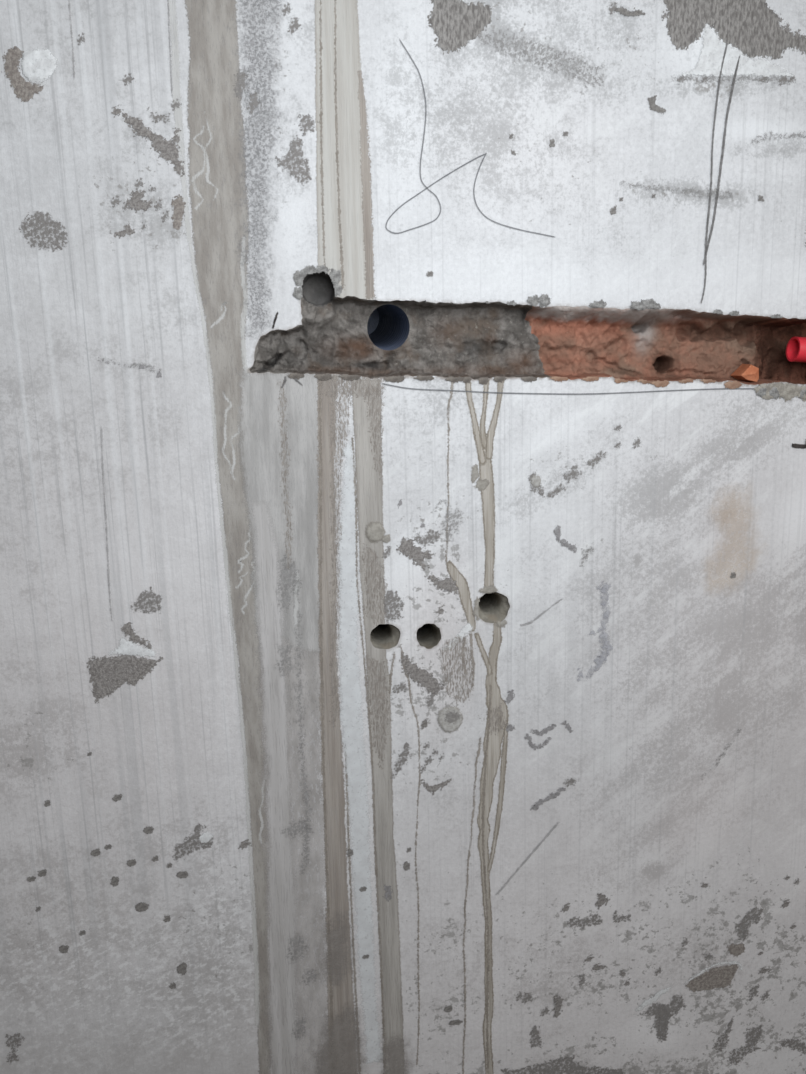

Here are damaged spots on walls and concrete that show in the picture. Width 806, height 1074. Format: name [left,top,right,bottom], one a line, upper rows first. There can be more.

peeling [2,46,57,102]
peeling [427,0,603,86]
peeling [661,0,806,60]
peeling [112,99,185,176]
peeling [19,211,68,252]
peeling [110,178,186,239]
peeling [292,265,343,299]
flaking render [521,294,806,399]
water stain [168,0,421,1074]
peeling [382,499,461,594]
peeling [86,586,164,704]
peeling [635,908,763,1041]